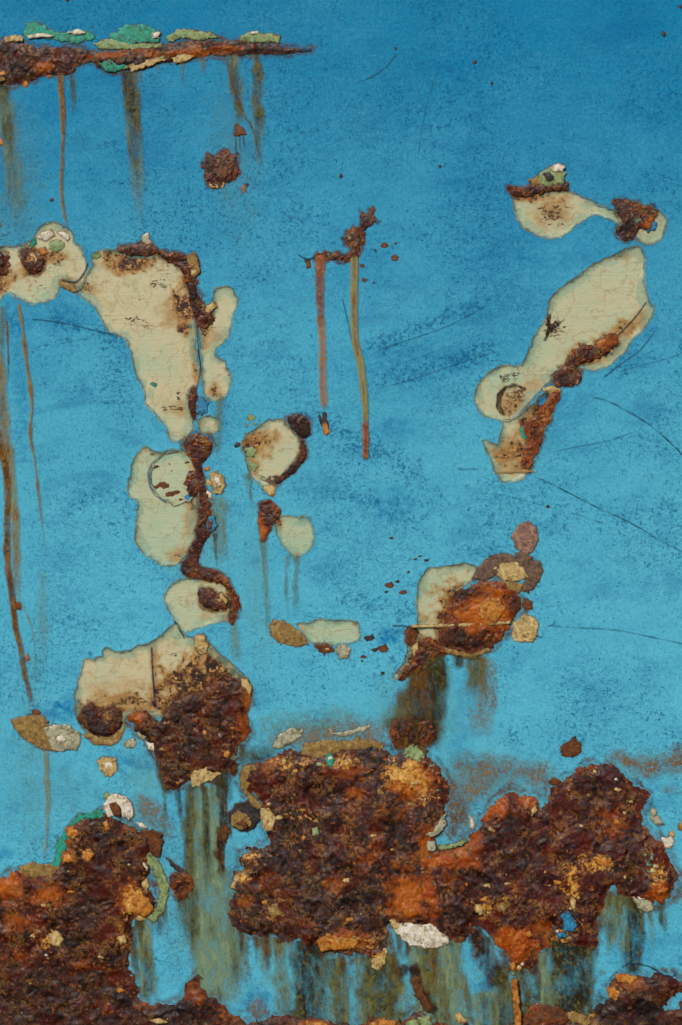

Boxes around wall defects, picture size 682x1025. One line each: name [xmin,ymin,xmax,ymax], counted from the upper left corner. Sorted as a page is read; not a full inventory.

rust [0,40,312,220]
rust [0,305,81,807]
peeling [0,221,239,567]
peeling [73,565,253,790]
peeling [234,414,315,569]
rust [299,206,399,459]
peeling [473,163,668,483]
damp [130,912,165,996]
rust [0,791,474,1025]
damp [156,758,594,1025]
rust [227,716,682,1025]
damp [599,891,663,974]